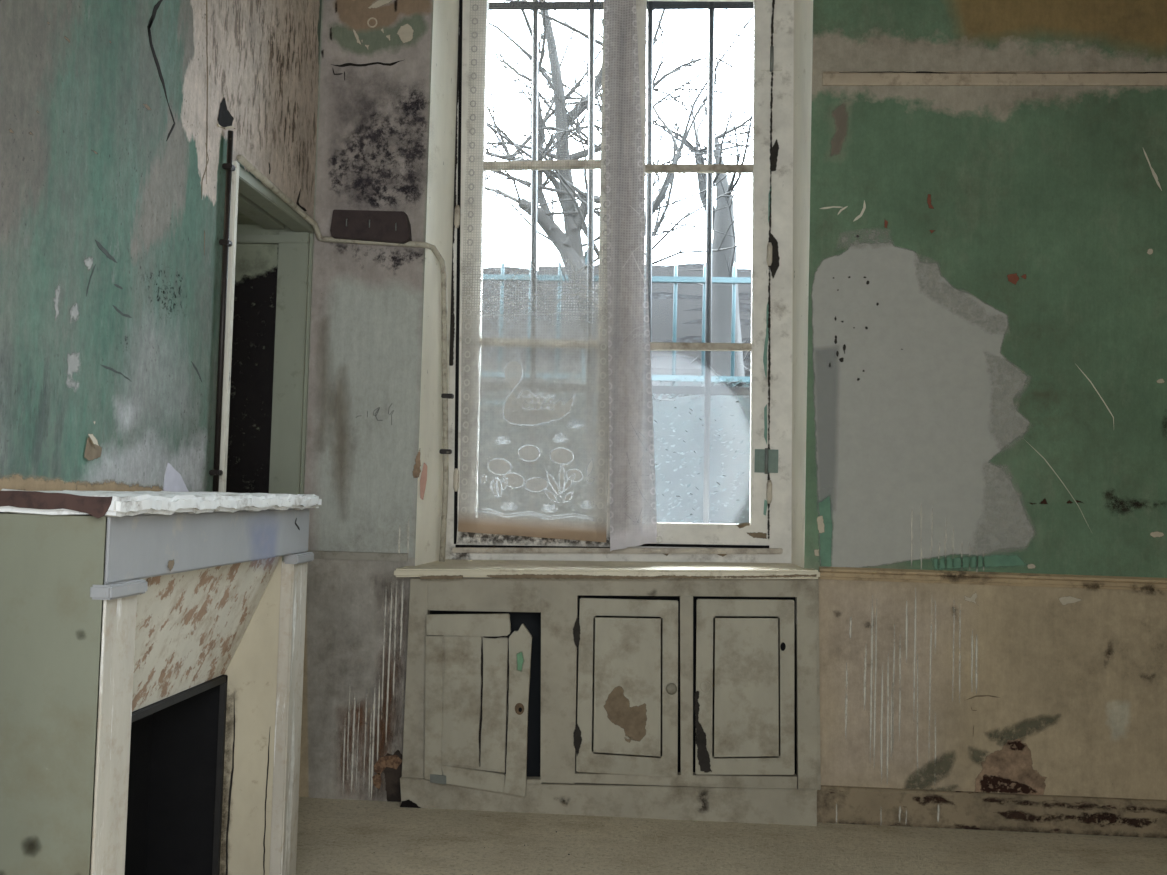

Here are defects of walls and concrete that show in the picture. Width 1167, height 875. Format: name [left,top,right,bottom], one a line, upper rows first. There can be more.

peeling [353,0,414,50]
crack [147,0,175,141]
crack [201,0,209,199]
spalling [217,98,236,129]
water stain [332,94,426,205]
peeling [54,286,79,321]
peeling [67,353,80,391]
peeling [84,421,102,461]
peeling [604,686,647,743]
peeling [913,795,955,805]
spalling [971,739,1167,828]